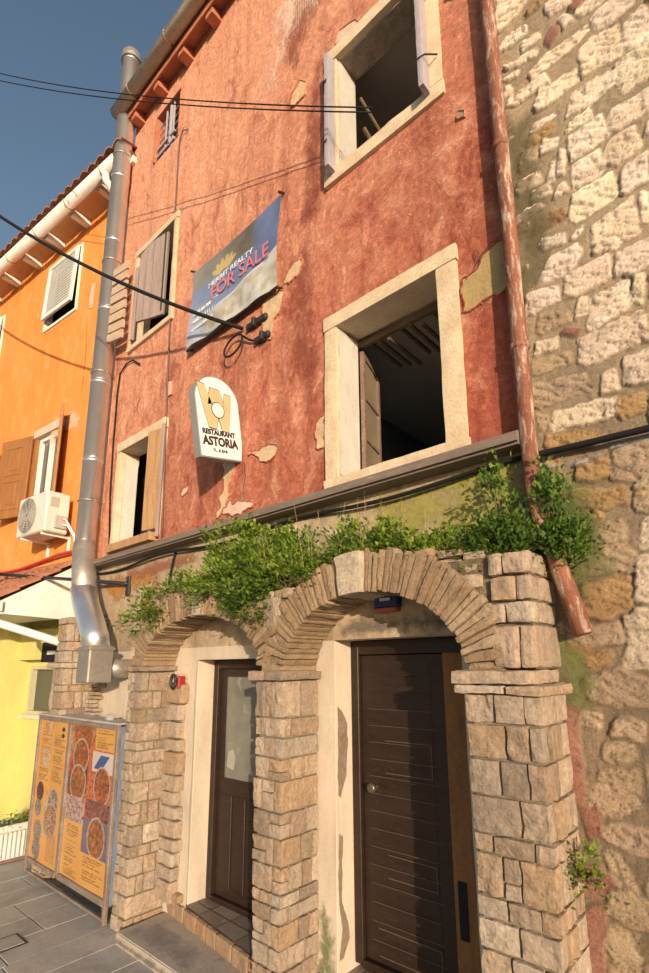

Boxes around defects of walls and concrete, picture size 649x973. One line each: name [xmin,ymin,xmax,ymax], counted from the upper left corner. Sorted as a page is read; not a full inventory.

damp [266,0,318,88]
peeling [290,79,308,108]
damp [303,92,322,221]
peeling [261,254,304,341]
peeling [459,239,507,316]
peeling [216,463,256,519]
peeling [248,441,281,464]
flaking render [338,707,348,798]
flaking render [338,834,350,961]